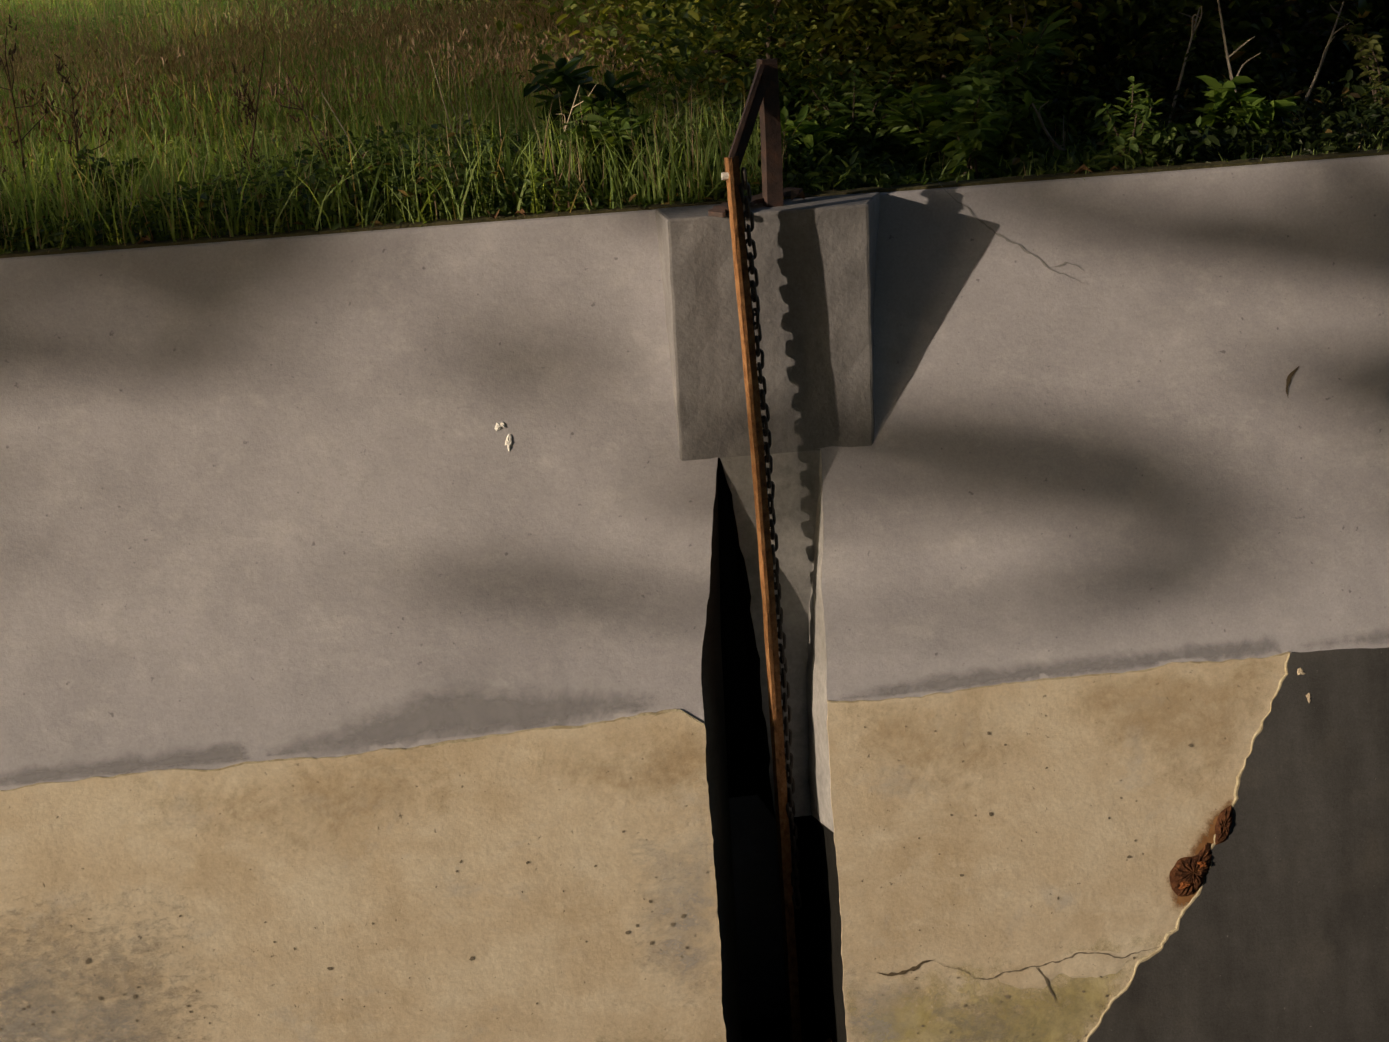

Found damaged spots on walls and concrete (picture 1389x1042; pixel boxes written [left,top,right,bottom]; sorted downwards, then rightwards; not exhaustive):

crack [937,180,1090,284]
peeling [0,709,726,1042]
peeling [827,651,1306,1042]
corrosion [1190,801,1230,857]
crack [879,947,1158,1002]